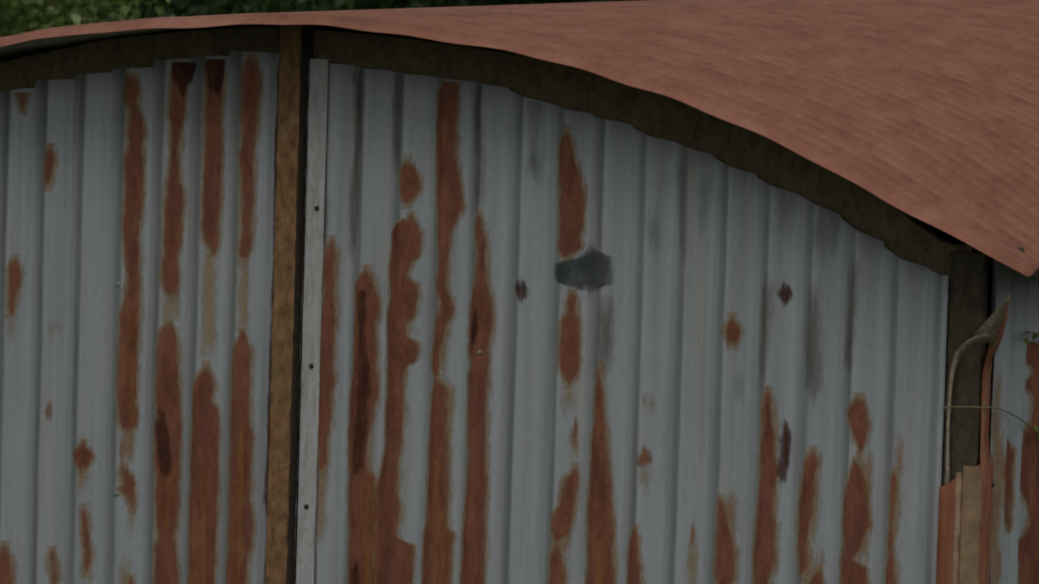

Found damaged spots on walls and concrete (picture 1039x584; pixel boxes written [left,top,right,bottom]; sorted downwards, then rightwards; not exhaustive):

corrosion [116,71,147,519]
corrosion [152,54,263,584]
corrosion [317,235,340,528]
corrosion [346,81,496,584]
corrosion [557,288,582,402]
corrosion [556,127,588,262]
corrosion [548,360,646,584]
corrosion [713,492,739,584]
corrosion [752,385,791,584]
corrosion [796,445,825,584]
corrosion [839,393,873,584]
corrosion [1003,342,1039,584]